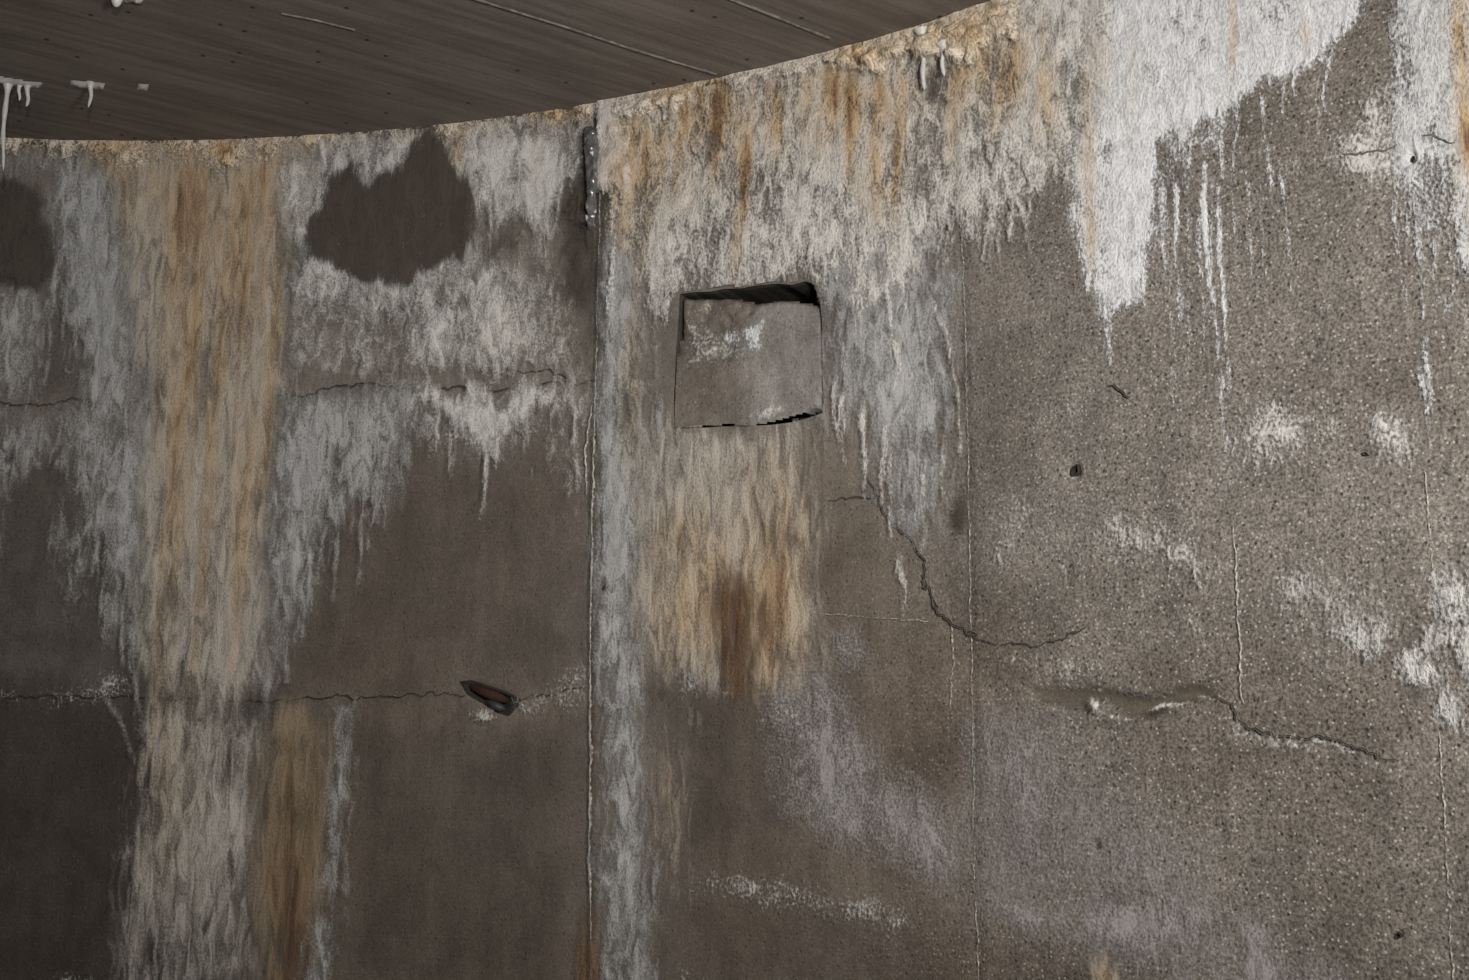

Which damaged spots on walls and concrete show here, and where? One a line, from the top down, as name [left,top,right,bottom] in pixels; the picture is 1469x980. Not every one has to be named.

leakage [0,76,42,88]
leakage [70,80,105,90]
leakage [1263,135,1296,211]
leakage [1324,0,1469,333]
leakage [1187,161,1228,359]
leakage [0,420,57,488]
crack [0,397,146,406]
leakage [1223,401,1336,465]
leakage [1094,515,1202,588]
rust [716,574,763,694]
leakage [1274,561,1469,733]
leakage [969,715,1281,980]